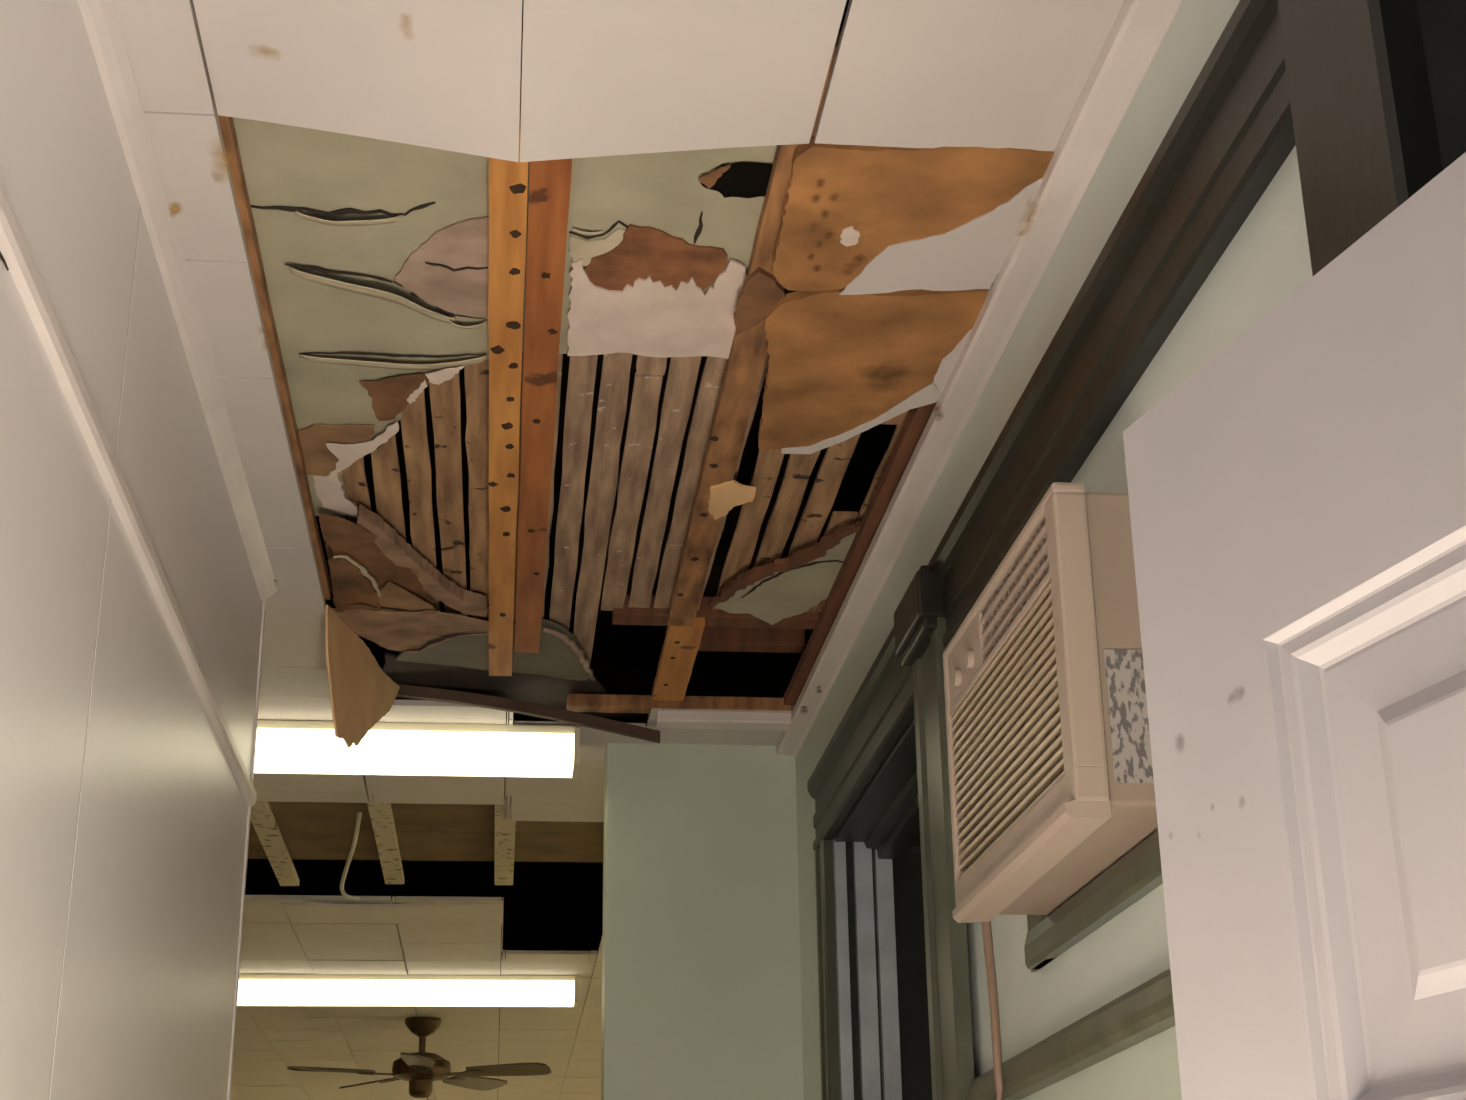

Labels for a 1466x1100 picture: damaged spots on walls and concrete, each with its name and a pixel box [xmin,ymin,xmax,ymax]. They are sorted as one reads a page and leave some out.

crack [251,202,436,226]
spalling [698,163,773,198]
crack [284,262,488,370]
flaking render [395,217,489,319]
flaking render [567,224,786,359]
spalling [298,366,489,654]
flaking render [708,480,756,520]
spalling [708,521,861,607]